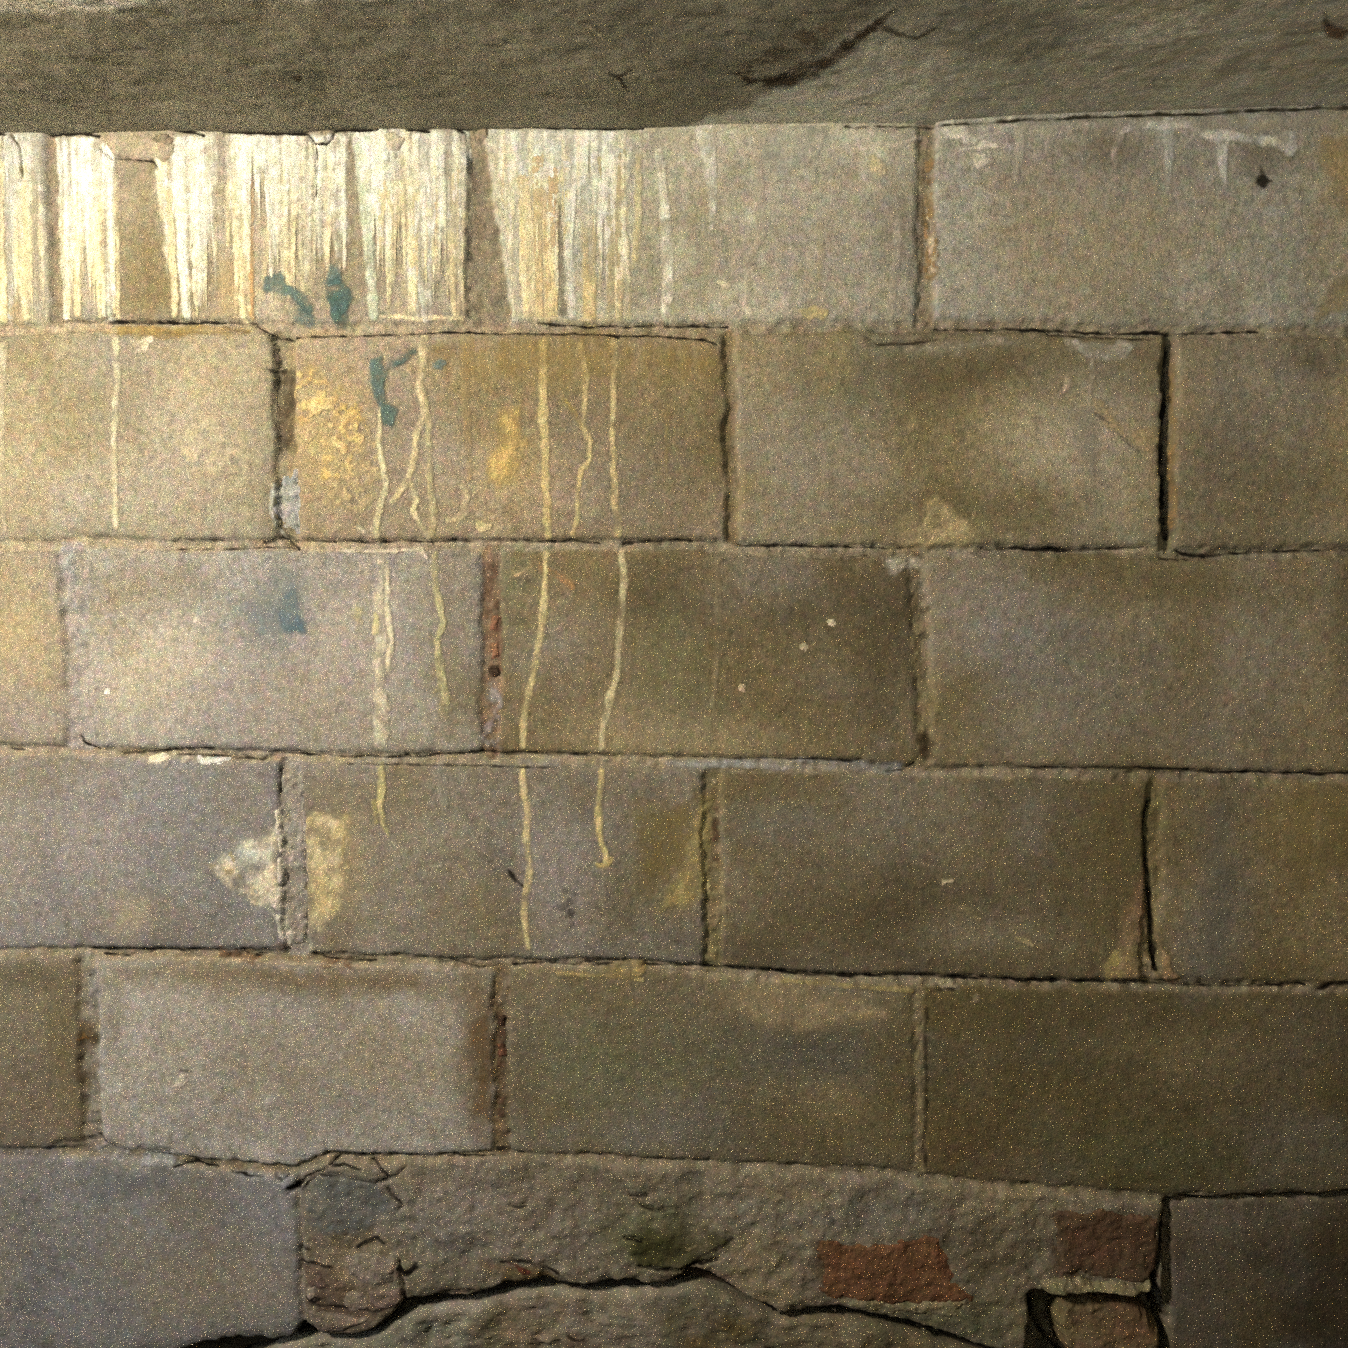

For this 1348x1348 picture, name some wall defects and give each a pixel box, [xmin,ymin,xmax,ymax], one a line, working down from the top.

damp [0,0,893,750]
damp [878,497,973,572]
damp [372,766,388,833]
damp [595,768,613,867]
damp [671,759,833,773]
crack [784,757,914,771]
damp [215,827,278,907]
damp [305,787,350,932]
damp [519,768,532,949]
crack [643,766,1348,991]
crack [92,947,386,969]
crack [435,959,611,971]